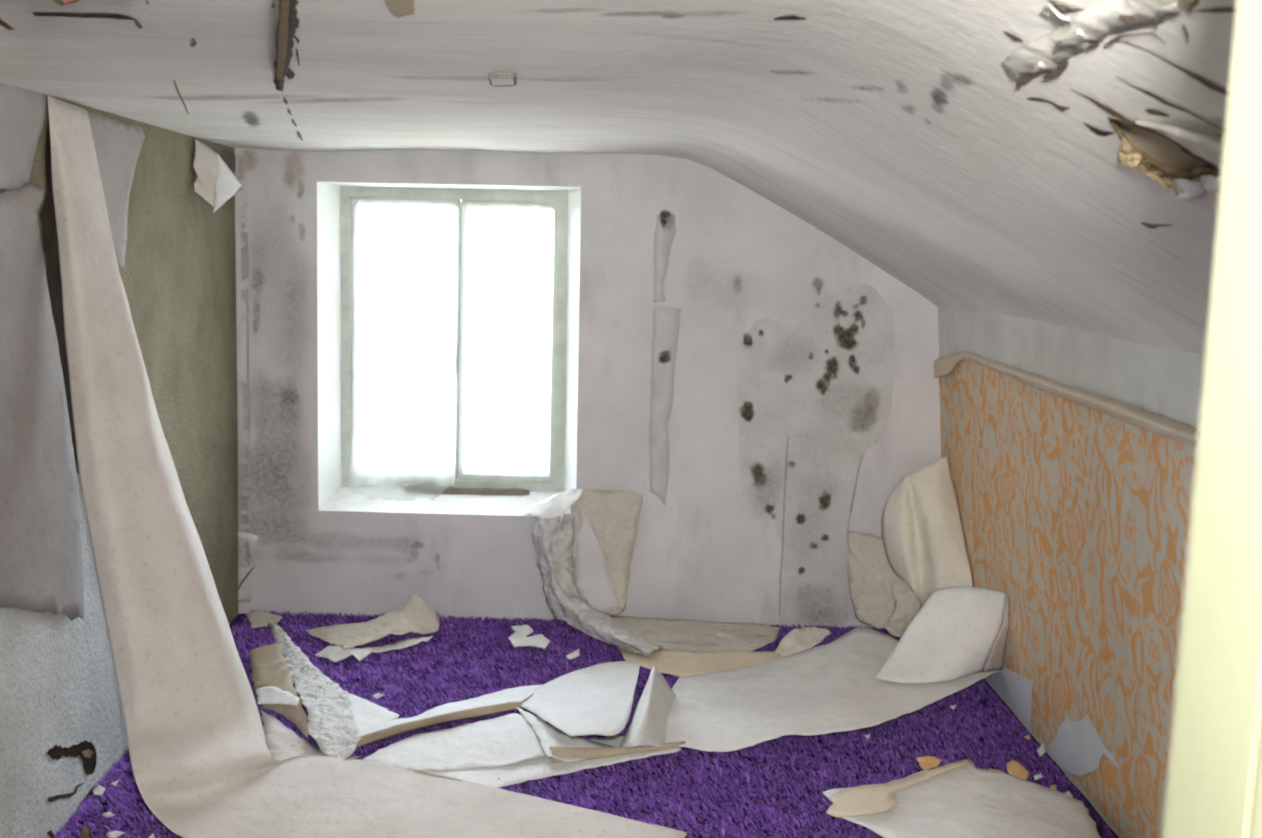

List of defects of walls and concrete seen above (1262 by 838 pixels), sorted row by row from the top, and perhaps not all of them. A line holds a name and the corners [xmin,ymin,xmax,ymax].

peeling [384,0,415,18]
peeling [1001,0,1200,89]
spalling [1108,117,1221,181]
peeling [193,140,251,603]
peeling [649,209,681,505]
leakage [810,296,866,394]
leakage [741,402,754,421]
leakage [753,464,763,483]
leakage [819,494,830,509]
flaking render [46,740,97,775]
peeling [1048,715,1119,776]